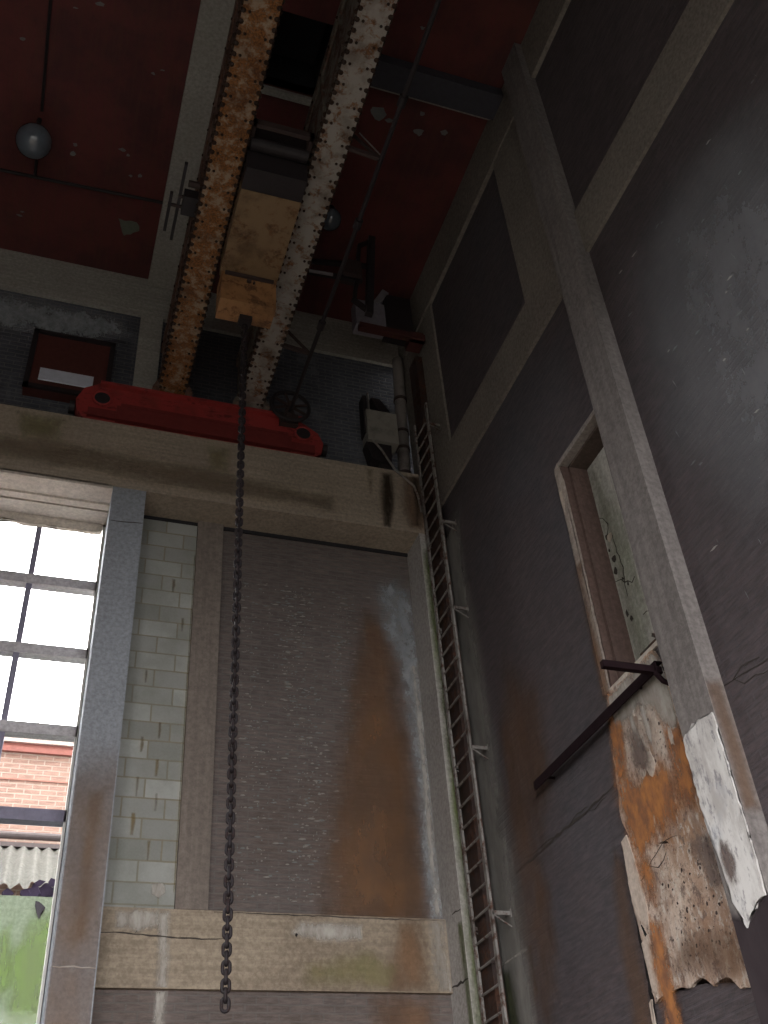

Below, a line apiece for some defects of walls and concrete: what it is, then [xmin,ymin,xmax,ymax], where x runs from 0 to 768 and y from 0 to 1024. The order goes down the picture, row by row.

crack [101,930,223,940]
leakage [231,583,451,989]
corrosion [335,631,418,918]
corrosion [594,642,695,902]
corrosion [649,917,681,1024]
flaking render [610,650,767,1004]